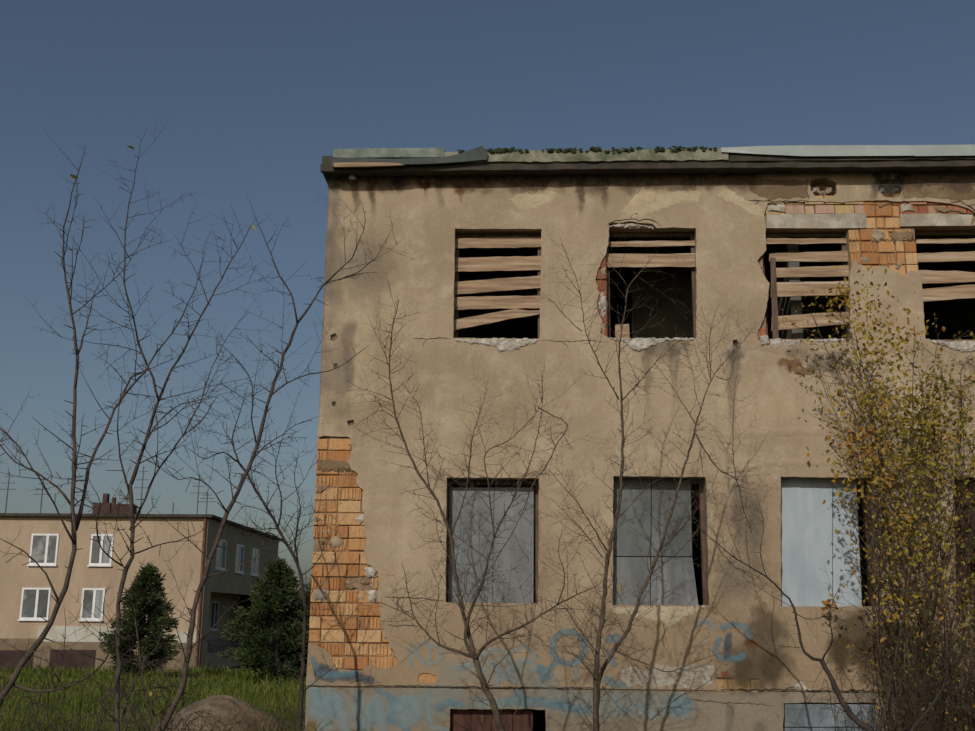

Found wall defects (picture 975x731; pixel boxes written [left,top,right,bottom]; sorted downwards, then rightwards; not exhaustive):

leakage [328,174,758,201]
leakage [872,172,975,195]
flaking render [596,255,608,336]
peeling [630,340,651,352]
flaking render [757,326,795,348]
peeling [948,341,969,351]
flaking render [309,420,398,670]
flaking render [620,664,773,692]